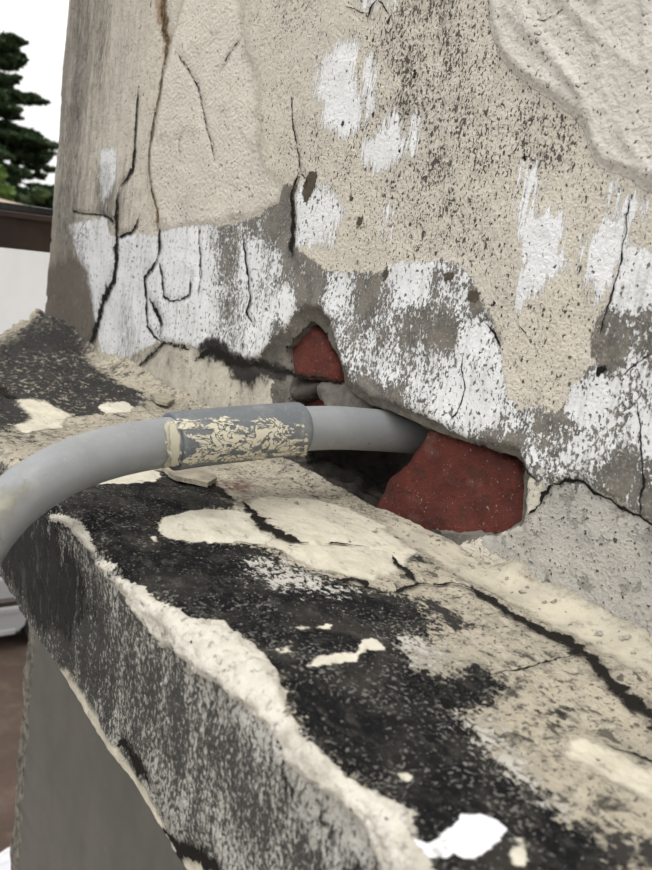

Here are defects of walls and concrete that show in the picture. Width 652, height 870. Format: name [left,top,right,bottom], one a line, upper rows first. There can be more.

crack [345,0,389,21]
crack [73,0,343,385]
crack [600,199,631,333]
peeling [69,144,652,634]
crack [522,393,652,525]
peeling [49,513,435,870]
peeling [373,626,465,685]
crack [333,555,652,729]
peeling [437,704,583,831]
crack [609,745,652,762]